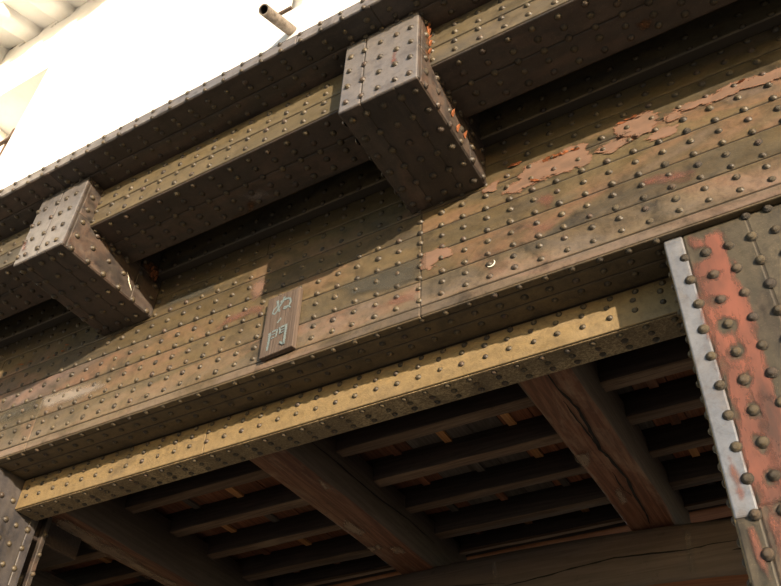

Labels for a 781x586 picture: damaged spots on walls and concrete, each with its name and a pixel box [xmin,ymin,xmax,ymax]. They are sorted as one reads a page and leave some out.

peeling [482,67,781,195]
peeling [420,246,454,271]
crack [547,374,650,524]
crack [454,540,741,586]